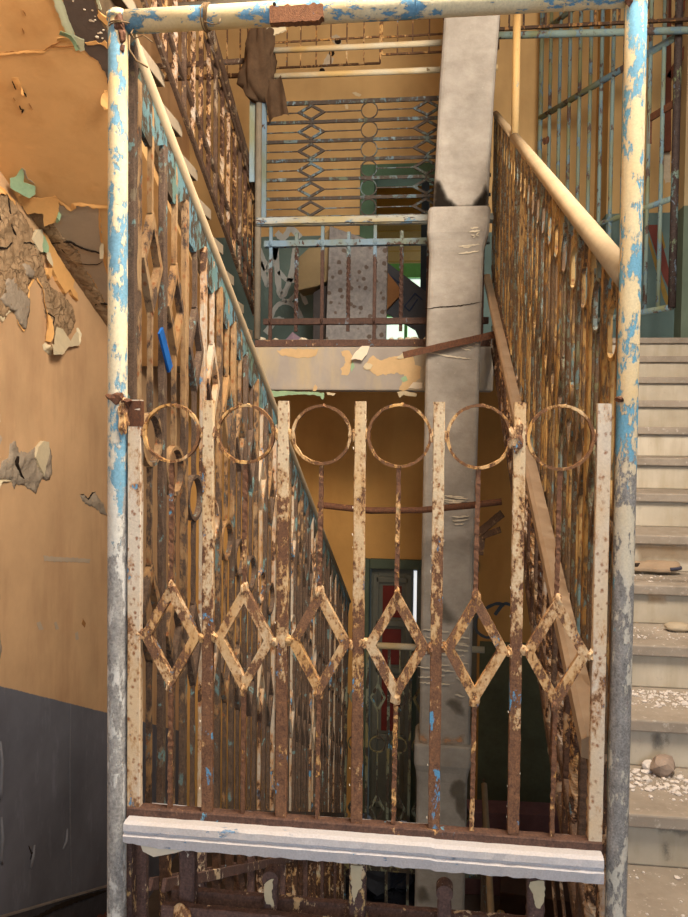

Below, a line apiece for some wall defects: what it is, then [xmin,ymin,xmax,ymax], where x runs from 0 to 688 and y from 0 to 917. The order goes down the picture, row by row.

spalling [0,168,108,356]
peeling [277,348,318,358]
peeling [272,385,336,400]
peeling [340,346,422,398]
spalling [0,435,52,494]